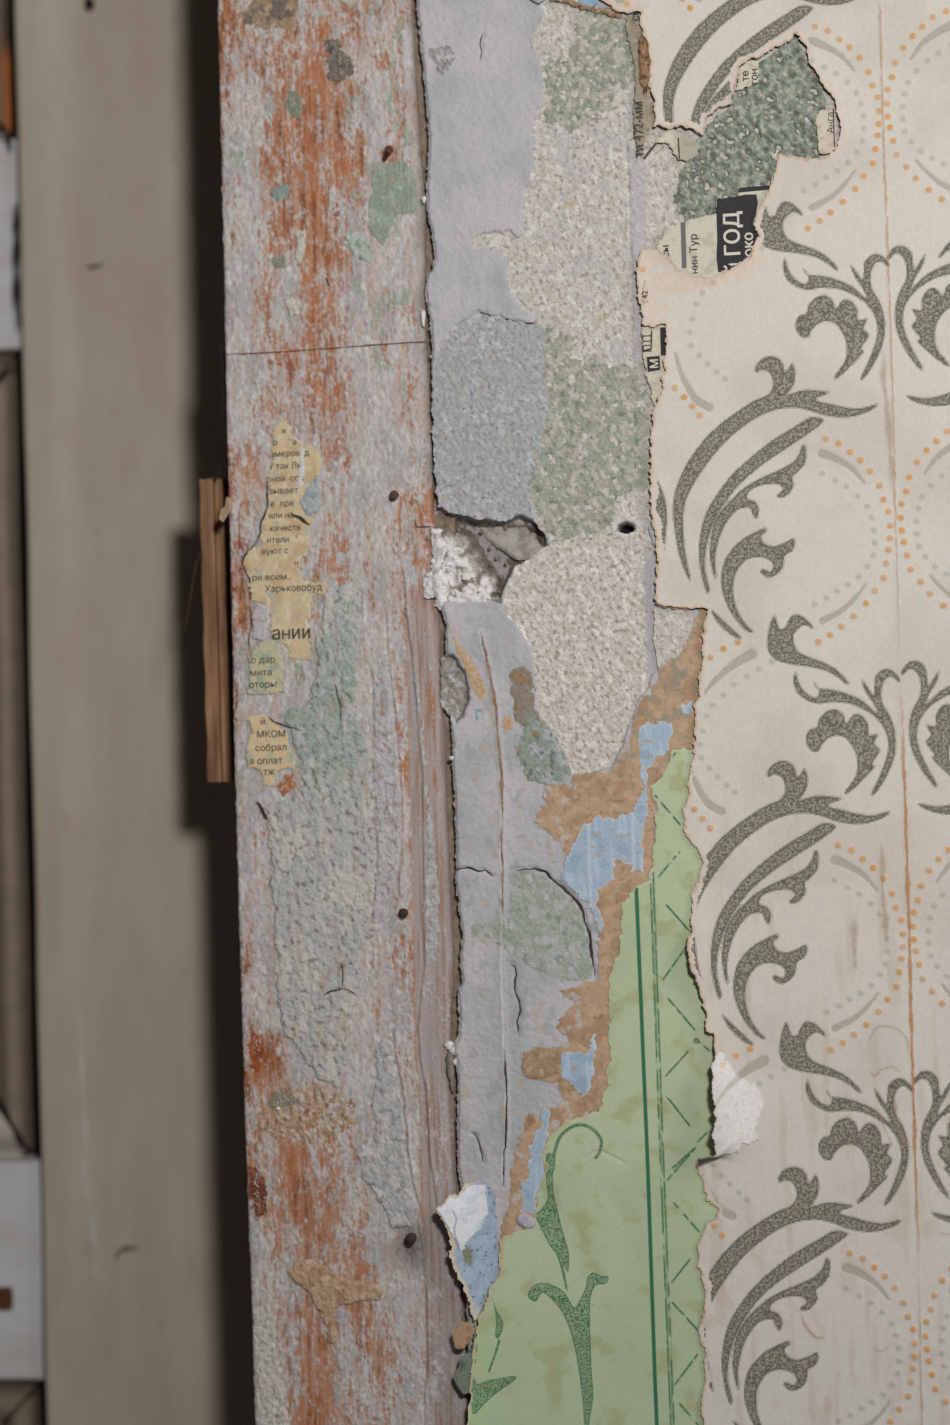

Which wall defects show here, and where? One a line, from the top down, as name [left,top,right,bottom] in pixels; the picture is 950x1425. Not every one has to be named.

peeling [324,38,354,82]
peeling [294,229,306,264]
spalling [423,0,842,774]
peeling [252,602,271,641]
flaking render [261,580,402,1148]
flaking render [410,668,441,965]
peeling [711,1052,764,1158]